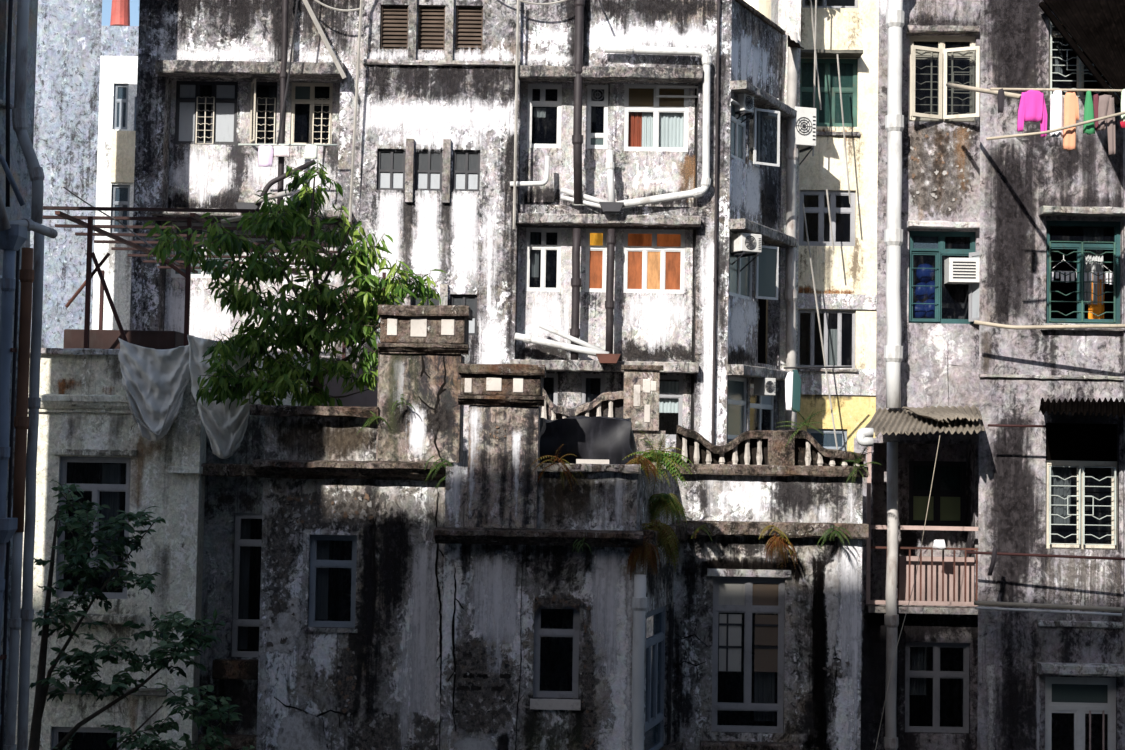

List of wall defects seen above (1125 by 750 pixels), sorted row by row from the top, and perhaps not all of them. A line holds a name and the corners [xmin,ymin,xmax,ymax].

damp [360,0,777,364]
crack [419,356,446,462]
damp [363,483,440,749]
crack [435,492,464,750]
damp [450,544,654,750]
damp [991,416,1041,750]